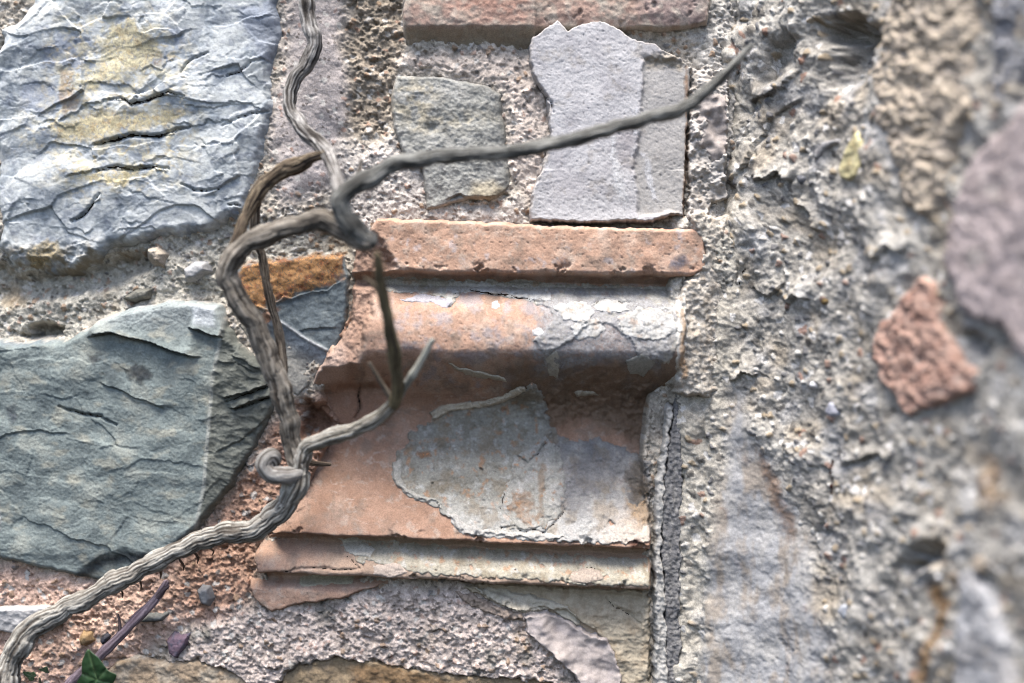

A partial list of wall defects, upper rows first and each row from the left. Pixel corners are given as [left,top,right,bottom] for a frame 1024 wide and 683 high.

peeling [314,227,689,393]
peeling [338,363,654,683]